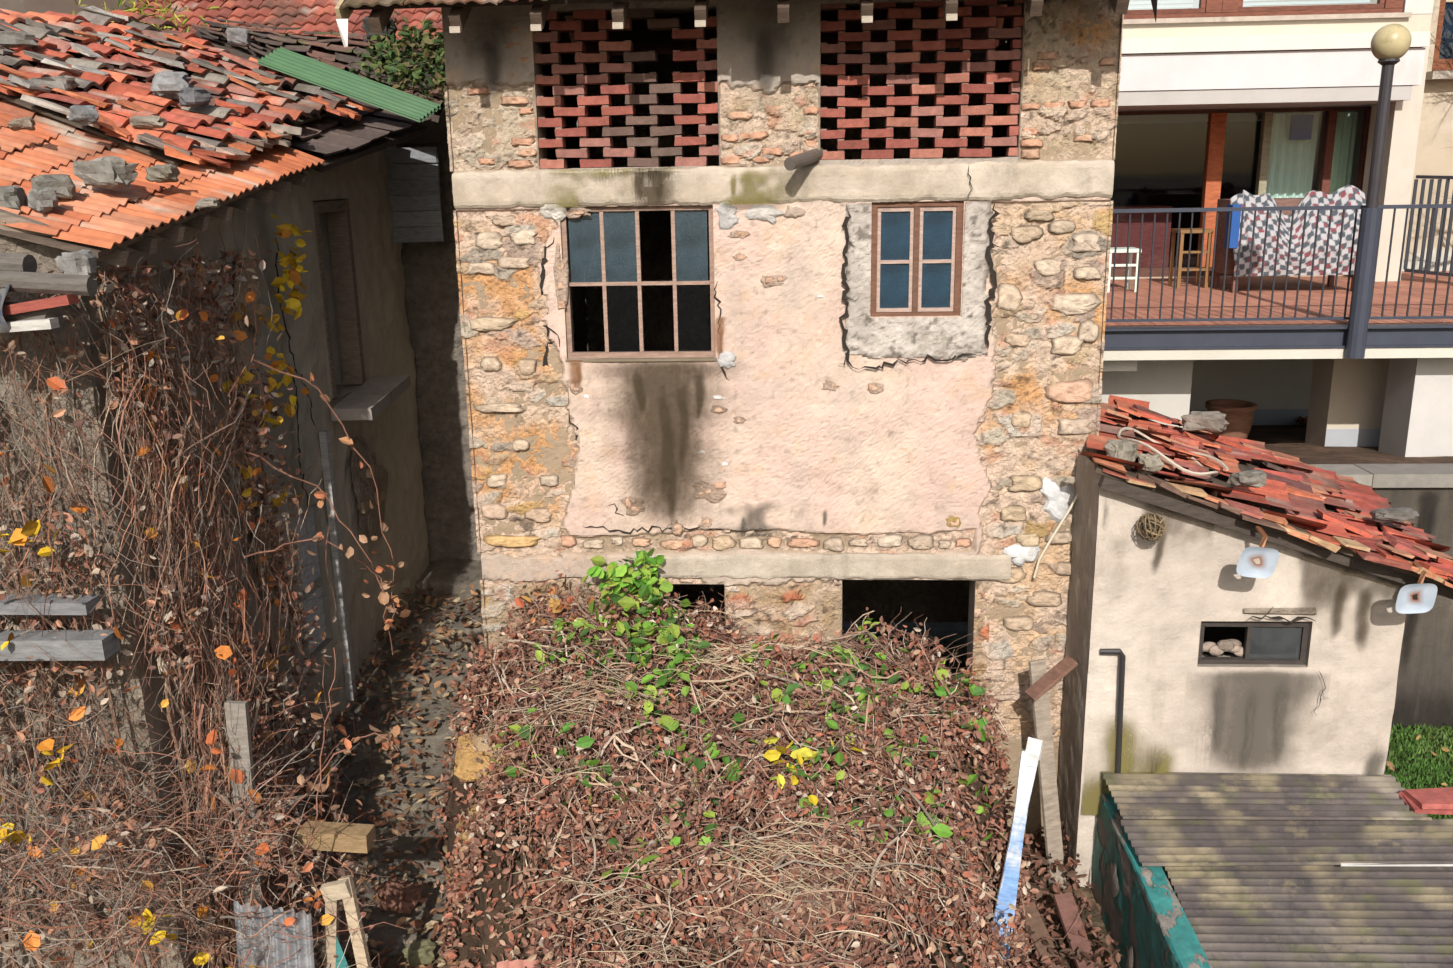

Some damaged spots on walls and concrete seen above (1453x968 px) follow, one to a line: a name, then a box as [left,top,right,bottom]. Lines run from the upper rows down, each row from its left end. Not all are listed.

spalling [720,83,819,167]
spalling [1019,0,1124,160]
leakage [618,362,711,513]
spalling [453,201,1113,741]
leakage [1418,493,1437,541]
leakage [1392,700,1453,729]